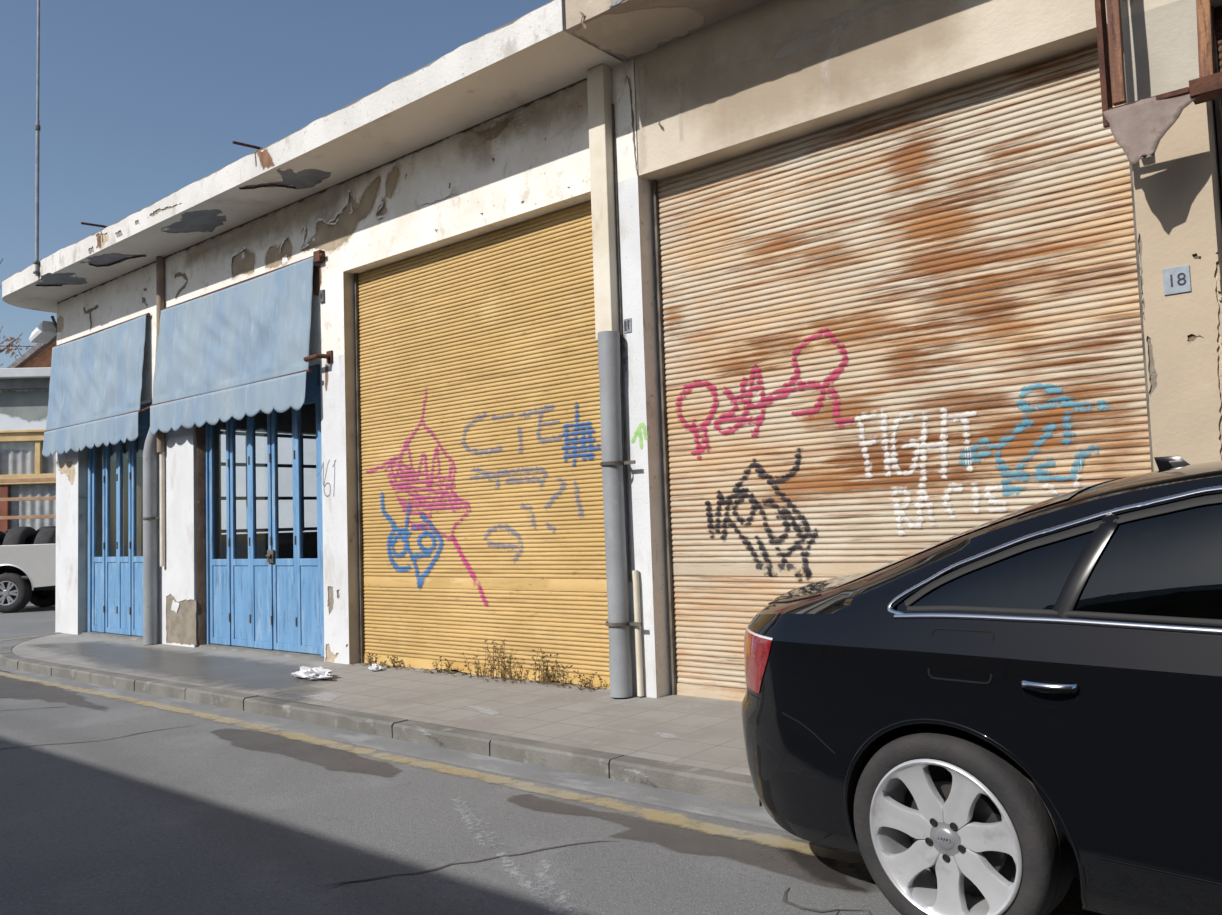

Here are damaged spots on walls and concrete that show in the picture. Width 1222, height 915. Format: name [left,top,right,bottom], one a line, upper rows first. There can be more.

rust [1009,62,1095,86]
rust [1214,6,1222,72]
rust [837,113,936,191]
flaking render [230,167,407,279]
rust [721,132,1139,381]
rust [767,378,1143,502]
flaking render [167,594,196,645]